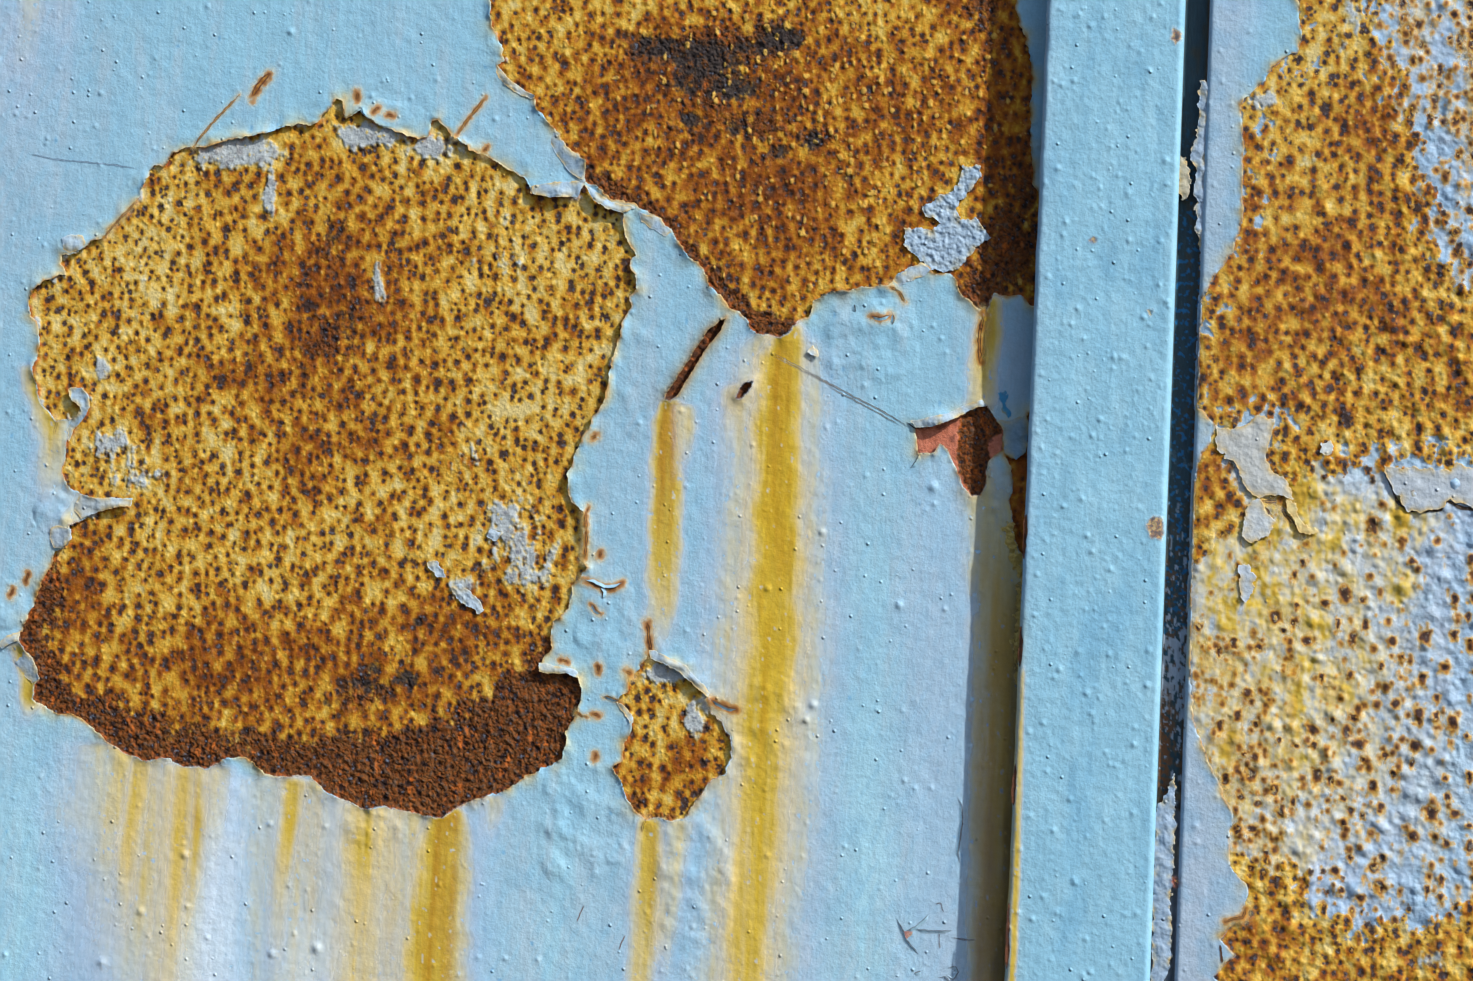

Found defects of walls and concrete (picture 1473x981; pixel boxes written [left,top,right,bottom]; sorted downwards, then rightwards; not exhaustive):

peeling [1233,96,1279,257]
peeling [1265,53,1322,81]
peeling [1361,0,1473,291]
corrosion [0,0,1039,981]
peeling [998,390,1011,421]
peeling [1187,462,1205,619]
peeling [1230,559,1275,614]
peeling [1194,283,1325,546]
peeling [1294,436,1473,944]